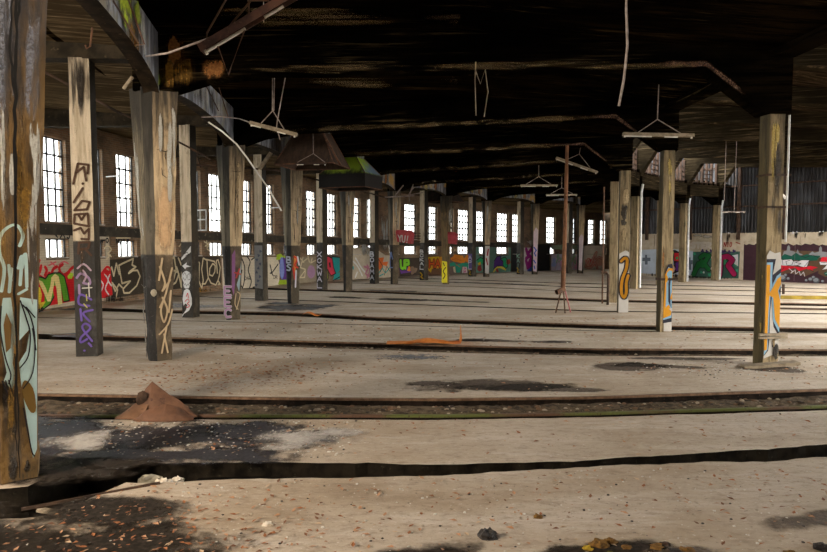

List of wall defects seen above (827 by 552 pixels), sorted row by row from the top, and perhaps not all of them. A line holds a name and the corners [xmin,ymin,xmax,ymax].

water stain [0,0,14,127]
water stain [25,23,38,115]
corrosion [158,35,190,86]
corrosion [204,60,224,78]
water stain [16,129,31,235]
crack [8,0,21,478]
water stain [8,317,19,439]